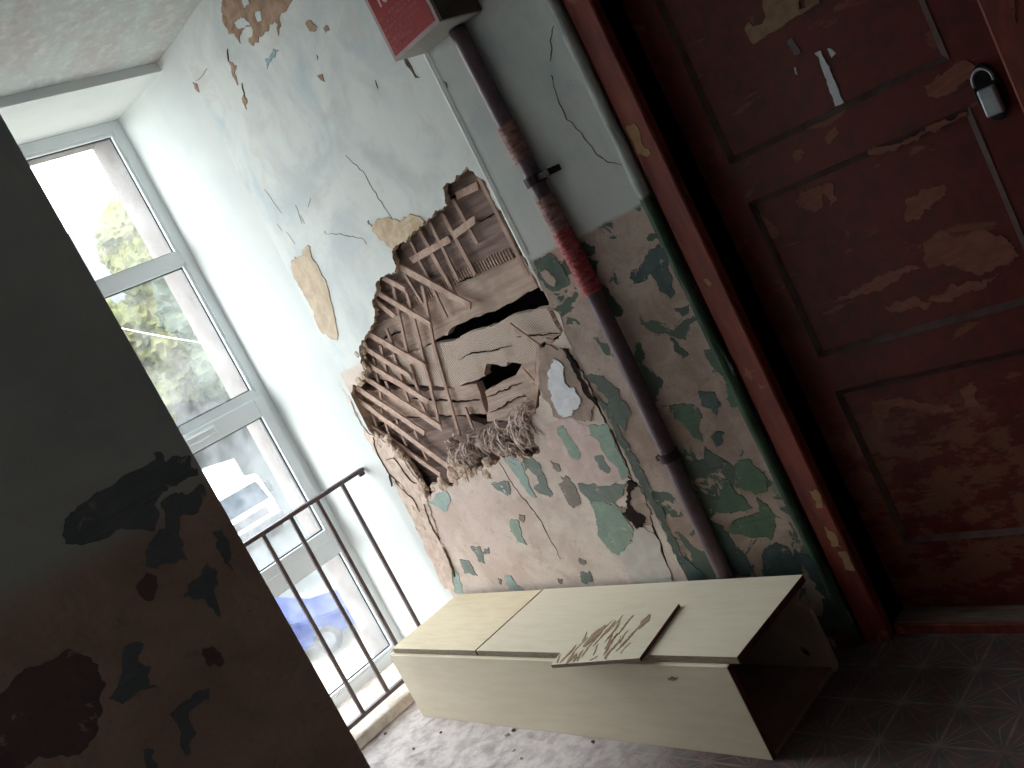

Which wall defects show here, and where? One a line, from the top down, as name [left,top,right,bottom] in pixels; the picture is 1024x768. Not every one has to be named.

spalling [221,0,293,46]
crack [550,26,622,165]
crack [264,155,392,244]
spalling [291,245,339,340]
spalling [351,169,708,594]
crack [596,402,633,481]
peeling [62,451,206,601]
peeling [183,530,234,617]
crack [467,463,560,558]
crack [651,519,668,566]
peeling [0,642,158,768]
peeling [170,688,210,757]